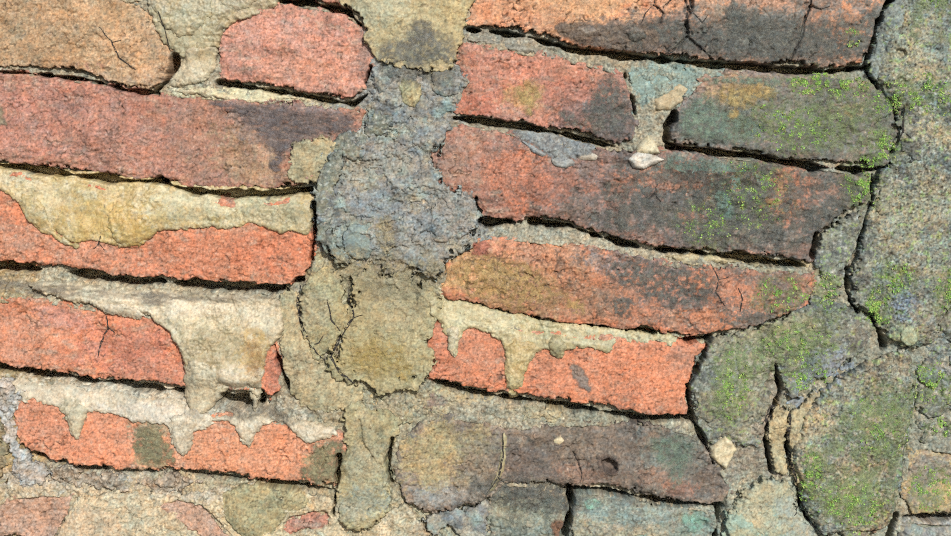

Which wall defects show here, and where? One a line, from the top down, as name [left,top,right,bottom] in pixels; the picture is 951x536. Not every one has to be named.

crack [641,0,710,59]
crack [784,0,829,63]
crack [296,280,361,387]
crack [762,365,828,536]